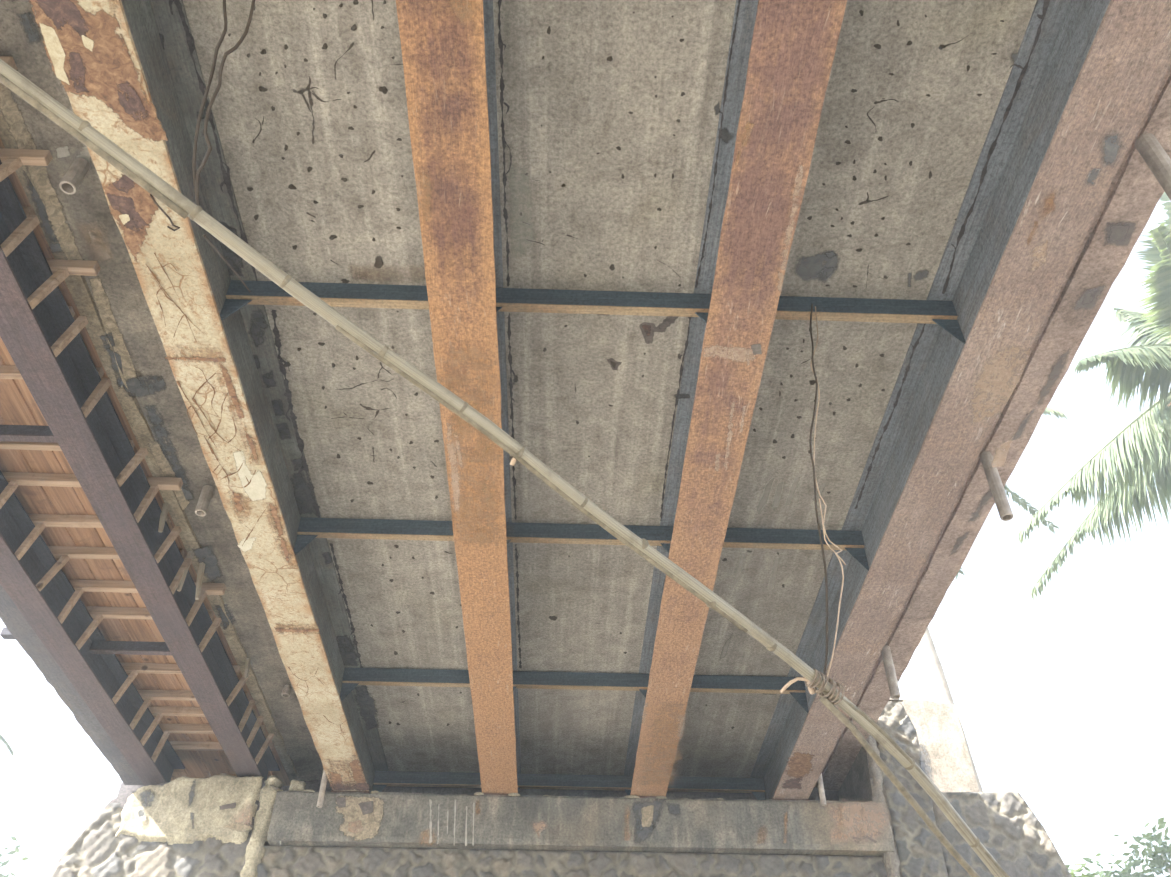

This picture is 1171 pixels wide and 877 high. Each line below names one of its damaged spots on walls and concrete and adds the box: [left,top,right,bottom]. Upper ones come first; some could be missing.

peeling [29,0,168,142]
peeling [103,174,158,262]
water stain [795,251,839,282]
crack [146,253,256,488]
rust [781,752,815,789]
peeling [134,790,155,823]
spalling [219,802,253,832]